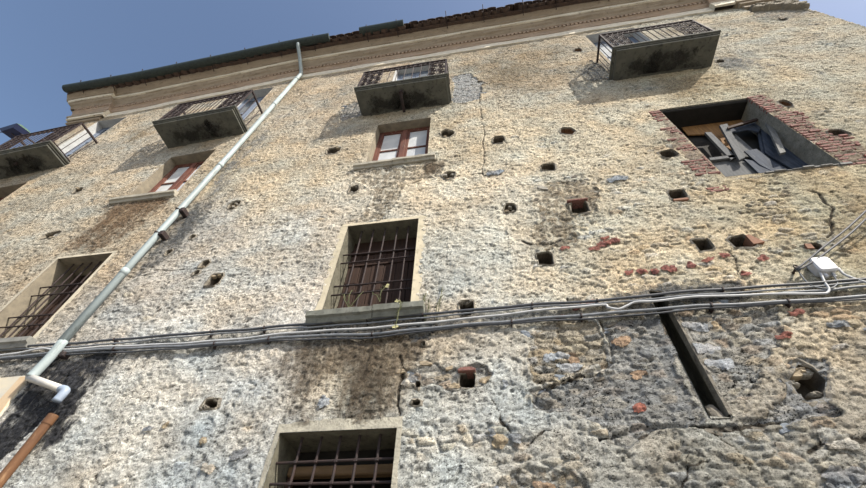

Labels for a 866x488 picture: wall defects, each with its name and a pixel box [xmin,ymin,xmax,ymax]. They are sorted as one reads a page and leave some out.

flaking render [649,110,721,176]
flaking render [746,95,866,165]
crack [812,192,851,238]
water stain [0,350,118,460]
spalling [521,300,861,450]